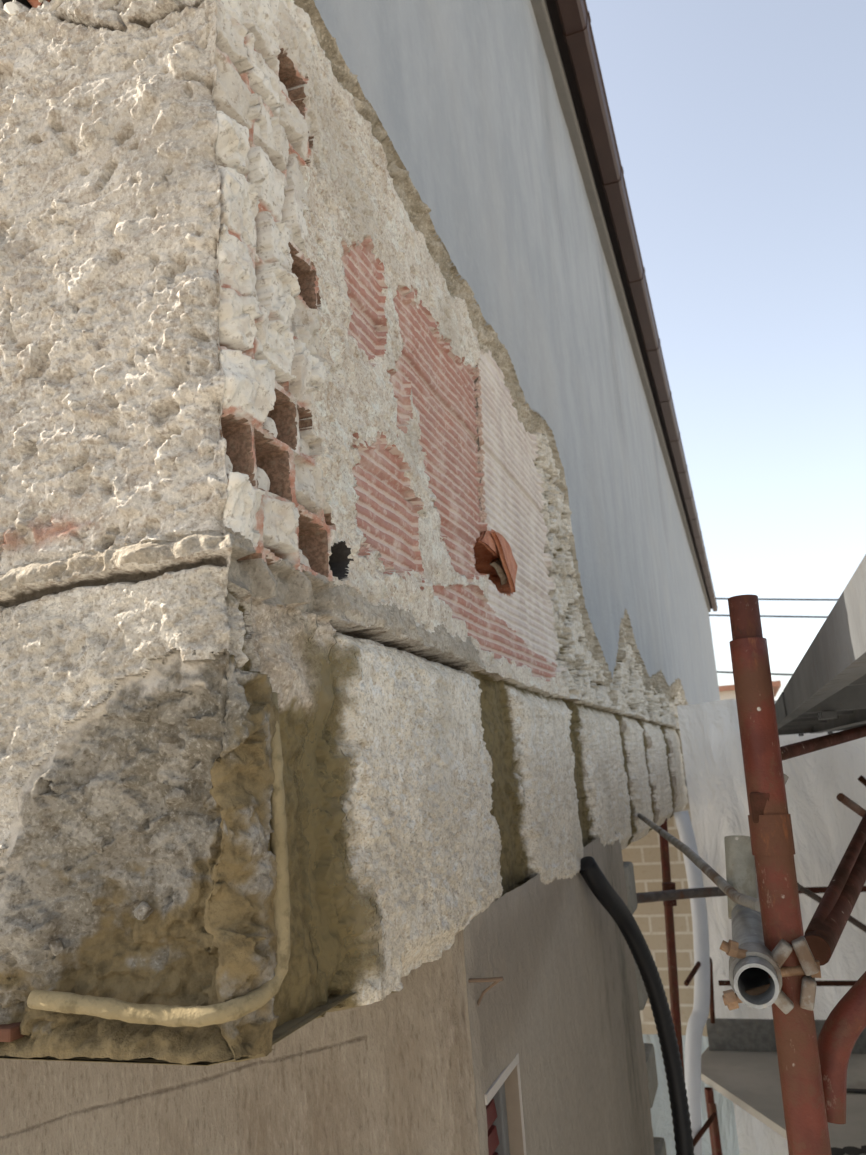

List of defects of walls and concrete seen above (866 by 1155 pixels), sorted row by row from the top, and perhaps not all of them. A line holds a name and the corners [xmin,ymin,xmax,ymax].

spalling [0,0,21,16]
crack [0,545,233,613]
spalling [216,223,337,581]
flaking render [294,0,688,729]
leakage [296,639,385,1001]
crack [0,1027,373,1144]